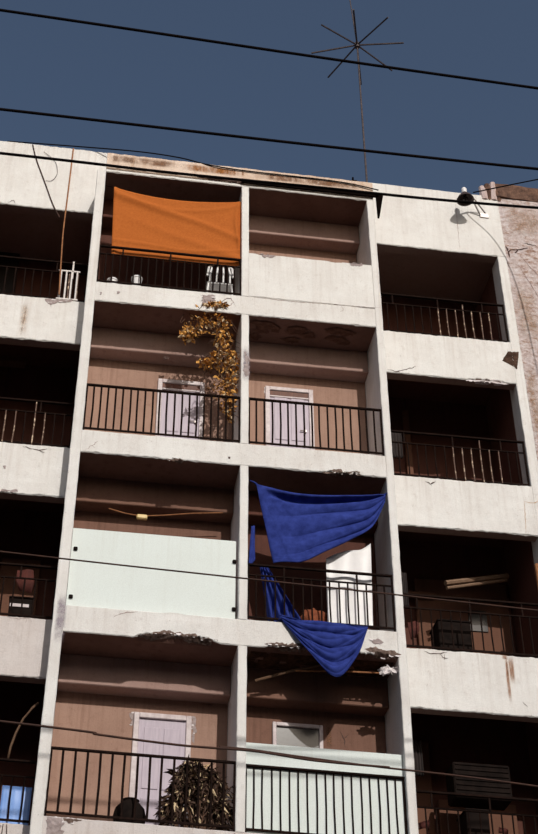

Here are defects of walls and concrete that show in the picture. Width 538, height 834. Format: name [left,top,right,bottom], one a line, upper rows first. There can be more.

spalling [502,351,519,369]
spalling [138,630,218,646]
spalling [346,638,401,676]
spalling [46,816,81,834]